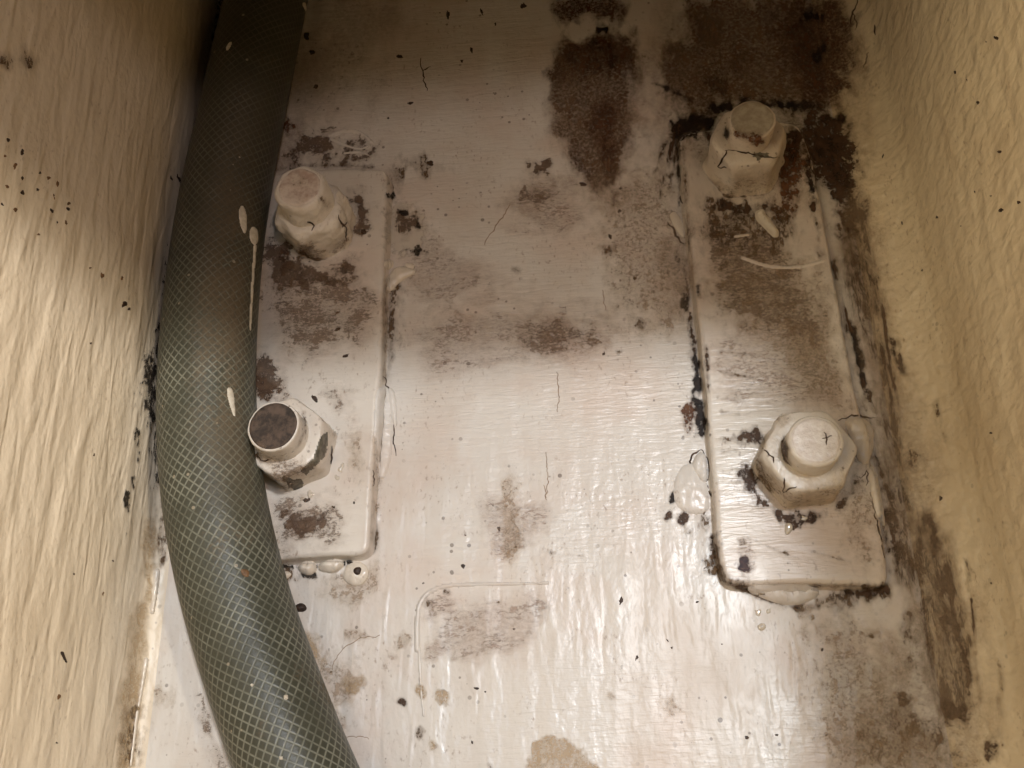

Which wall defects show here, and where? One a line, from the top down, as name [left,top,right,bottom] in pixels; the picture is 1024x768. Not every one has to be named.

corrosion [656,0,978,768]
corrosion [974,741,998,762]